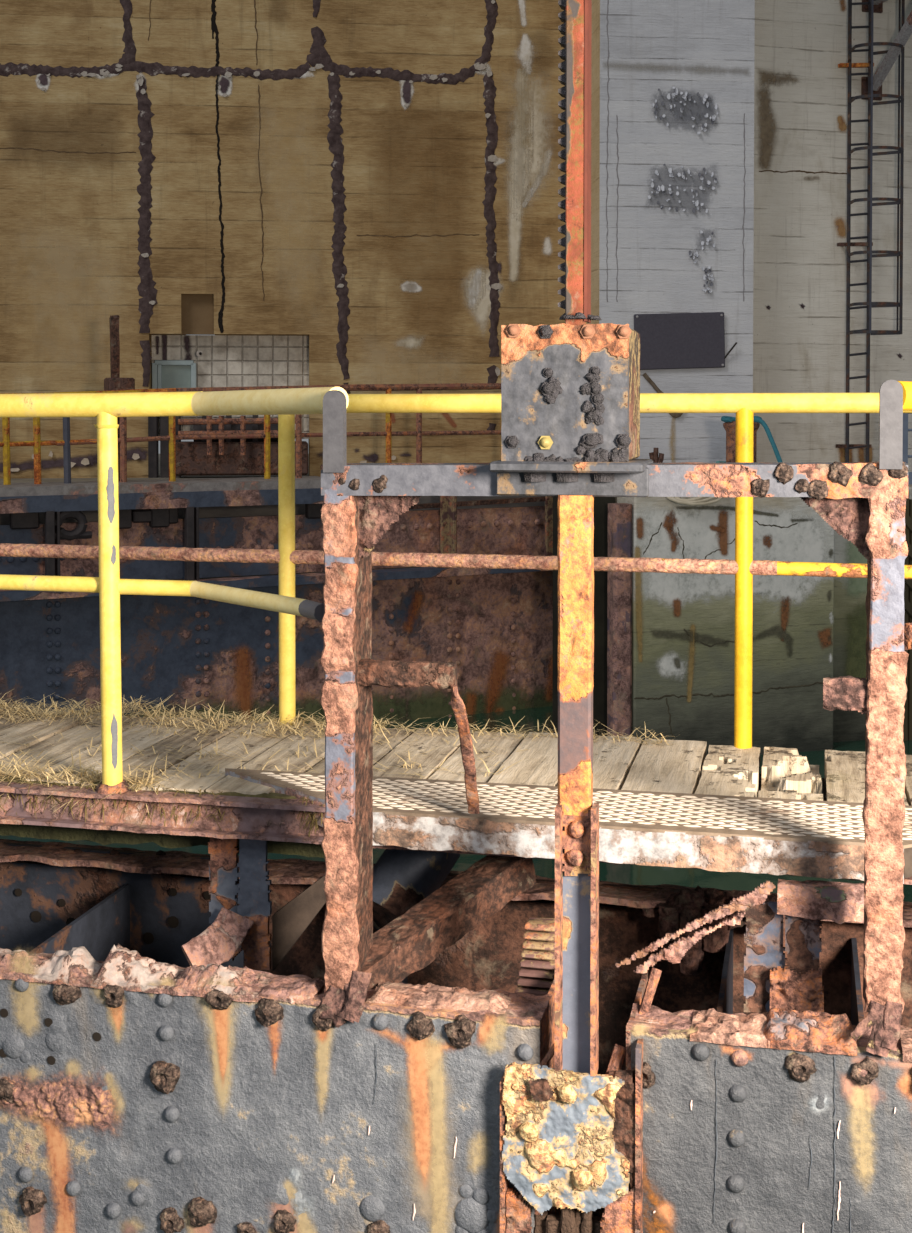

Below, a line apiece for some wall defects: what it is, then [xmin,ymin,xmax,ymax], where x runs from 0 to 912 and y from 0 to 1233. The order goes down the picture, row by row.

crack [0,0,504,394]
water stain [509,0,551,281]
peeling [652,86,718,134]
water stain [753,510,809,522]
water stain [653,631,728,646]
water stain [756,626,792,655]
corrosion [0,944,325,1103]
corrosion [366,981,512,1048]
corrosion [0,1064,122,1233]
corrosion [382,1030,454,1233]
corrosion [608,1068,671,1233]
corrosion [844,1079,878,1175]